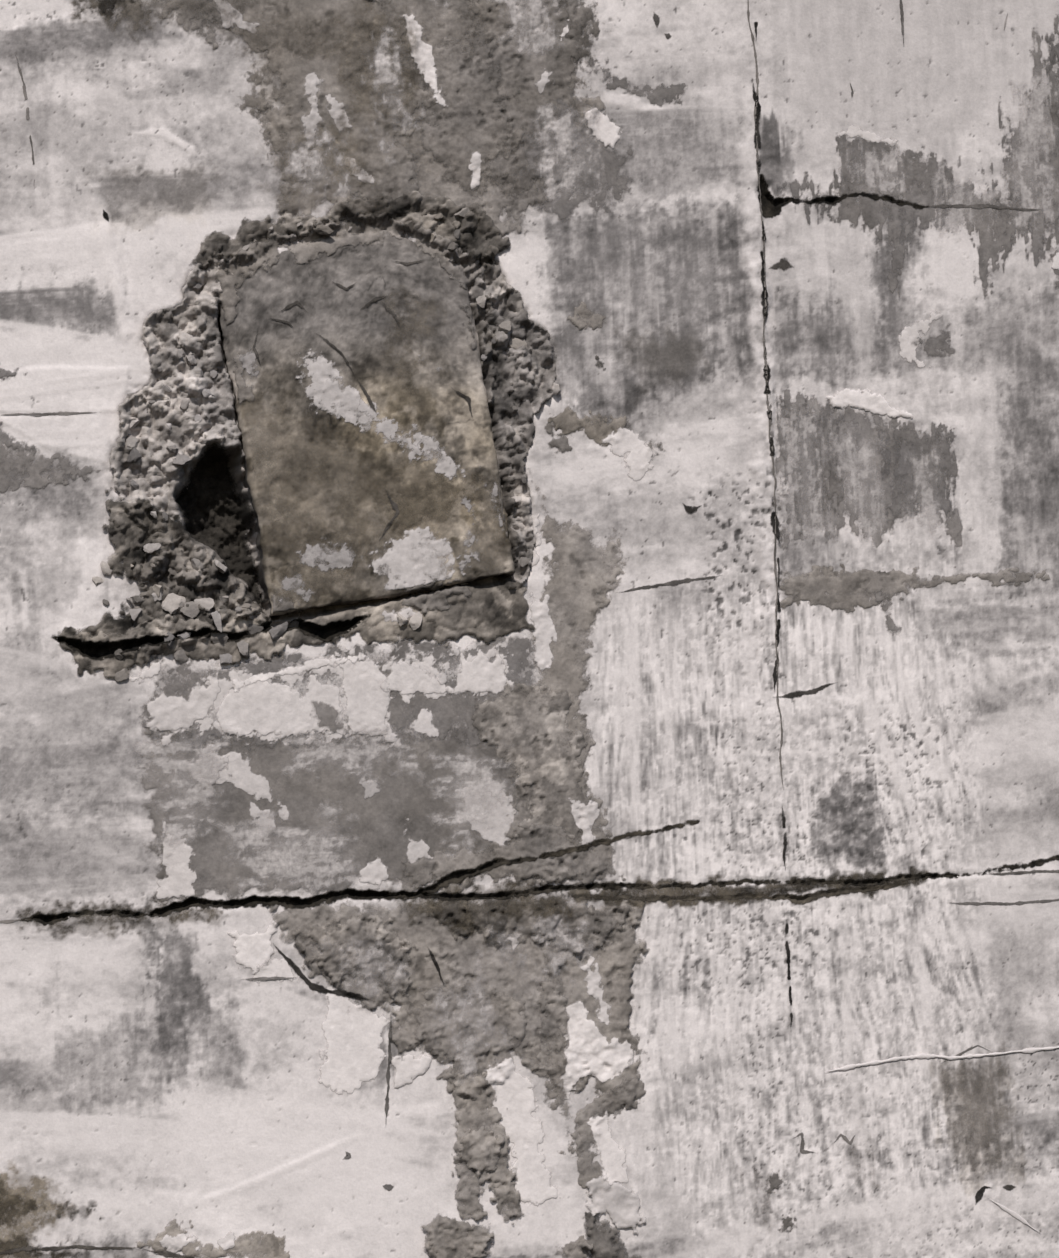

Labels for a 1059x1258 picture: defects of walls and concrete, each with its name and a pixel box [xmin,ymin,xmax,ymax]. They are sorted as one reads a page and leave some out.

crack [653,13,671,39]
crack [3,410,96,418]
crack [253,301,376,412]
spalling [0,0,686,902]
crack [747,0,1039,784]
rust [250,407,507,602]
crack [683,504,700,514]
crack [623,575,720,592]
crack [0,808,1059,1025]
crack [384,1022,392,1118]
crack [0,1245,194,1258]
spalling [137,1219,290,1258]